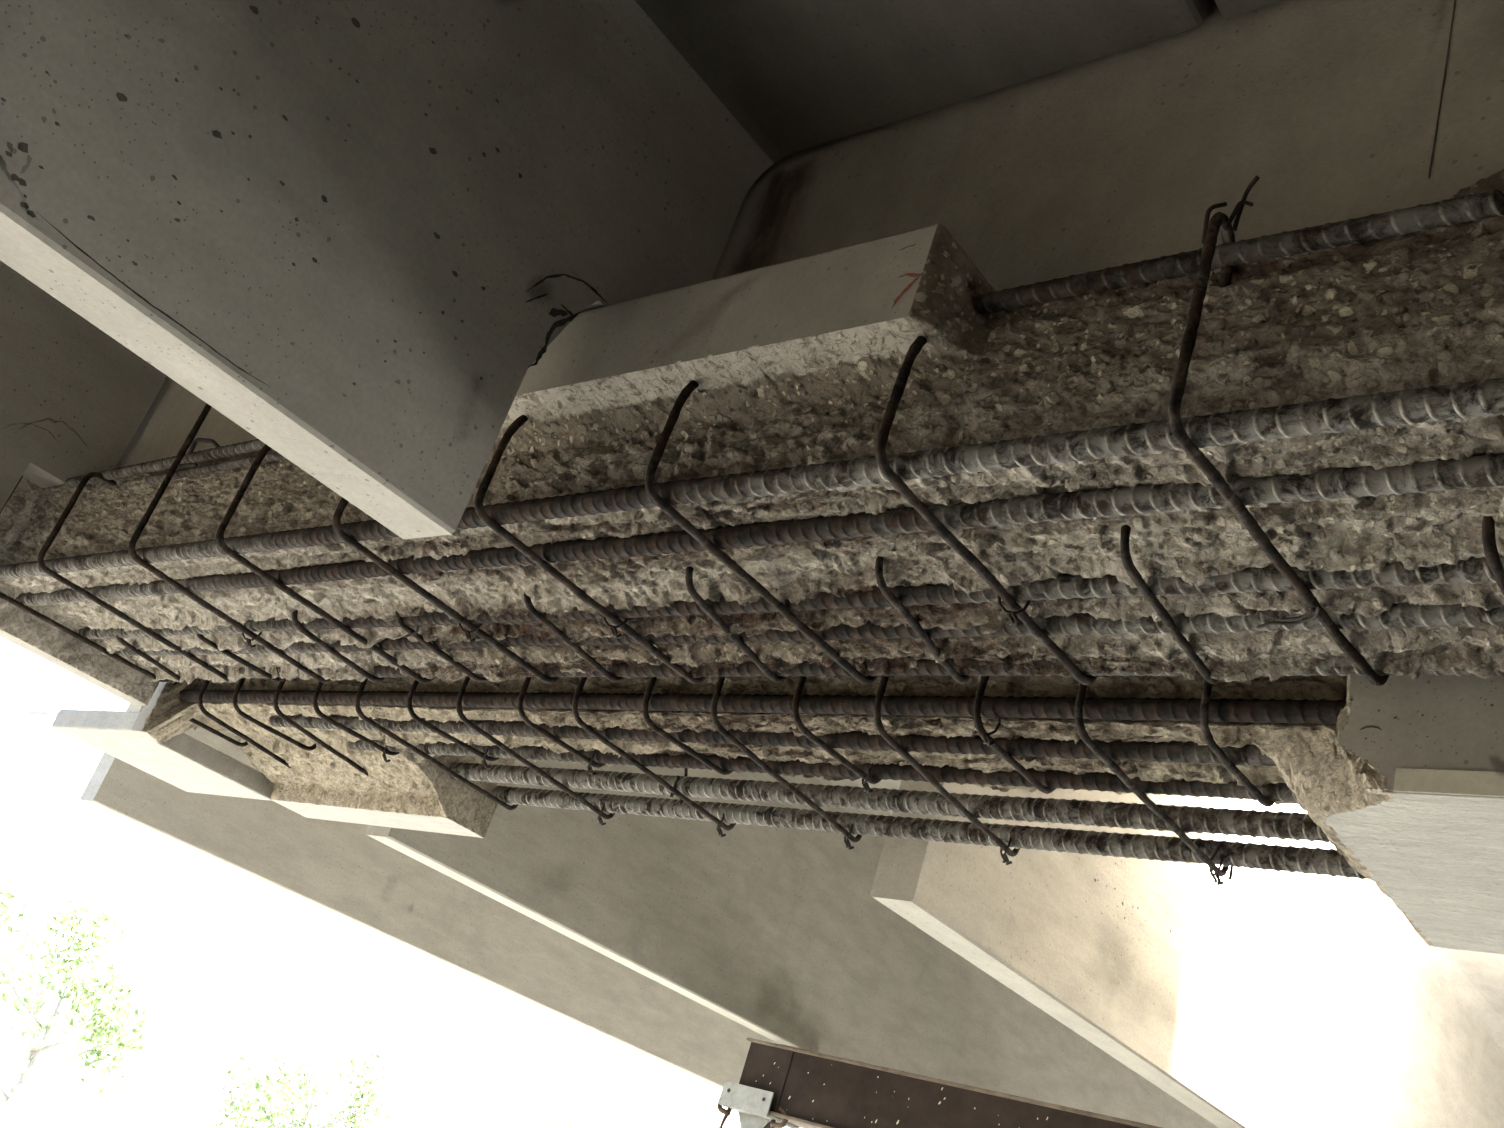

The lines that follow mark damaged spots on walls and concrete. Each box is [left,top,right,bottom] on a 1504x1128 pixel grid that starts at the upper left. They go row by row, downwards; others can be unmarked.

crack [1428,0,1457,179]
spalling [0,142,44,218]
spalling [1448,169,1504,200]
crack [525,274,606,368]
spalling [466,216,1504,508]
spalling [0,413,1504,947]